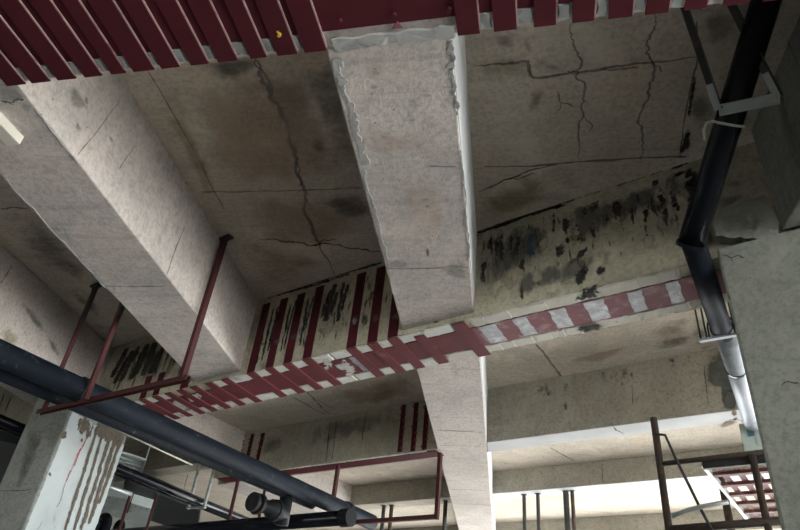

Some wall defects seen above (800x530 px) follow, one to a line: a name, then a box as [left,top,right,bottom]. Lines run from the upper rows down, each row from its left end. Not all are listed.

crack [254,59,382,299]
spalling [446,40,460,115]
crack [476,14,695,233]
leakage [521,259,589,292]
peeling [64,417,126,530]